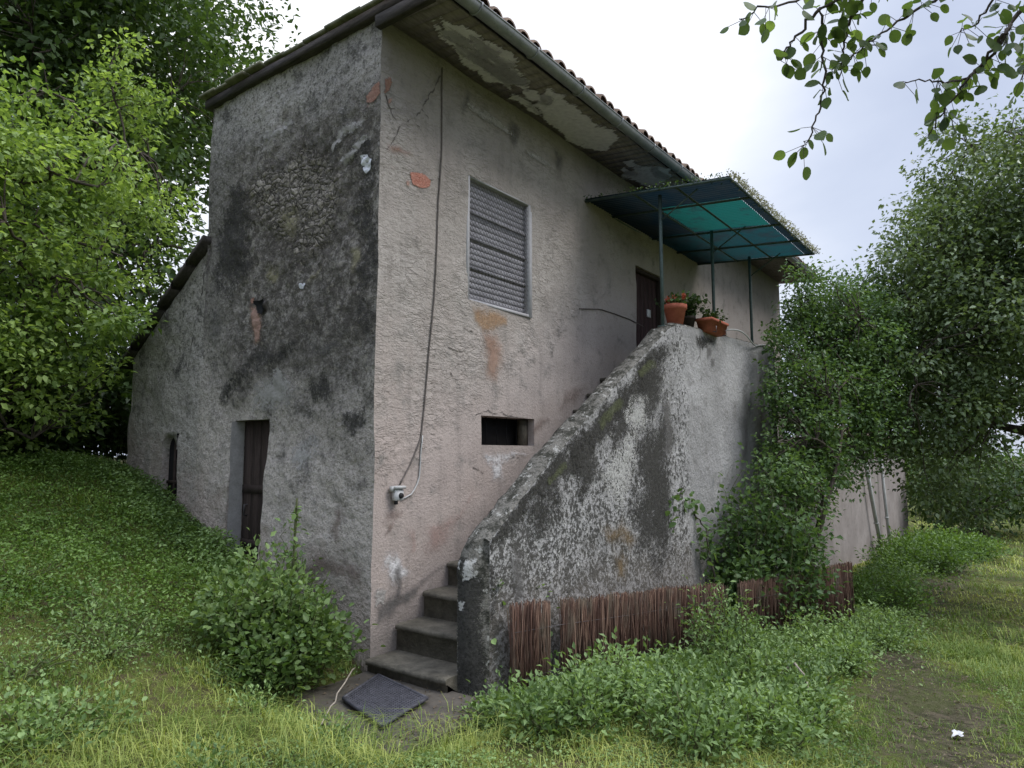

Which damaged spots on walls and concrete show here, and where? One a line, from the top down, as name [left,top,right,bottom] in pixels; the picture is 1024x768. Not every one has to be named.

peeling [432,16,620,151]
damp [216,182,252,307]
spalling [247,118,372,263]
damp [352,139,378,334]
spalling [407,172,431,188]
peeling [621,159,672,189]
damp [219,340,295,405]
spalling [251,298,264,342]
damp [342,407,366,436]
damp [457,343,677,695]